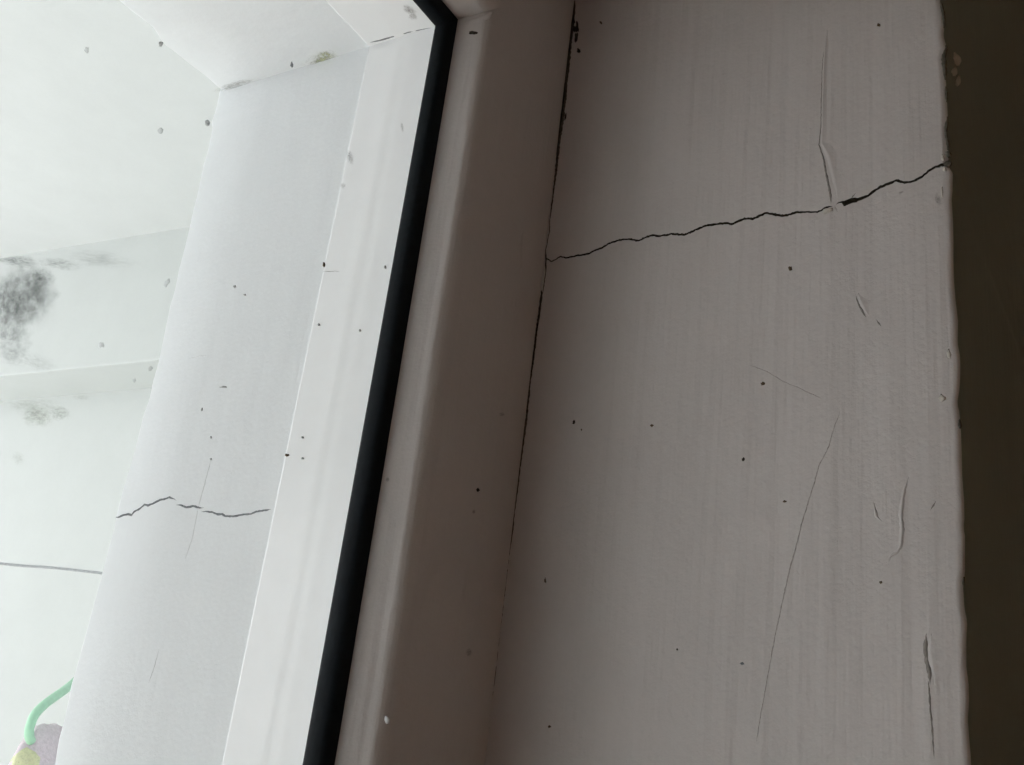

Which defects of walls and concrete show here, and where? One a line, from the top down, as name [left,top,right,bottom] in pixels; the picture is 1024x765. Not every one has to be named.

crack [116,464,271,558]
crack [494,0,952,684]